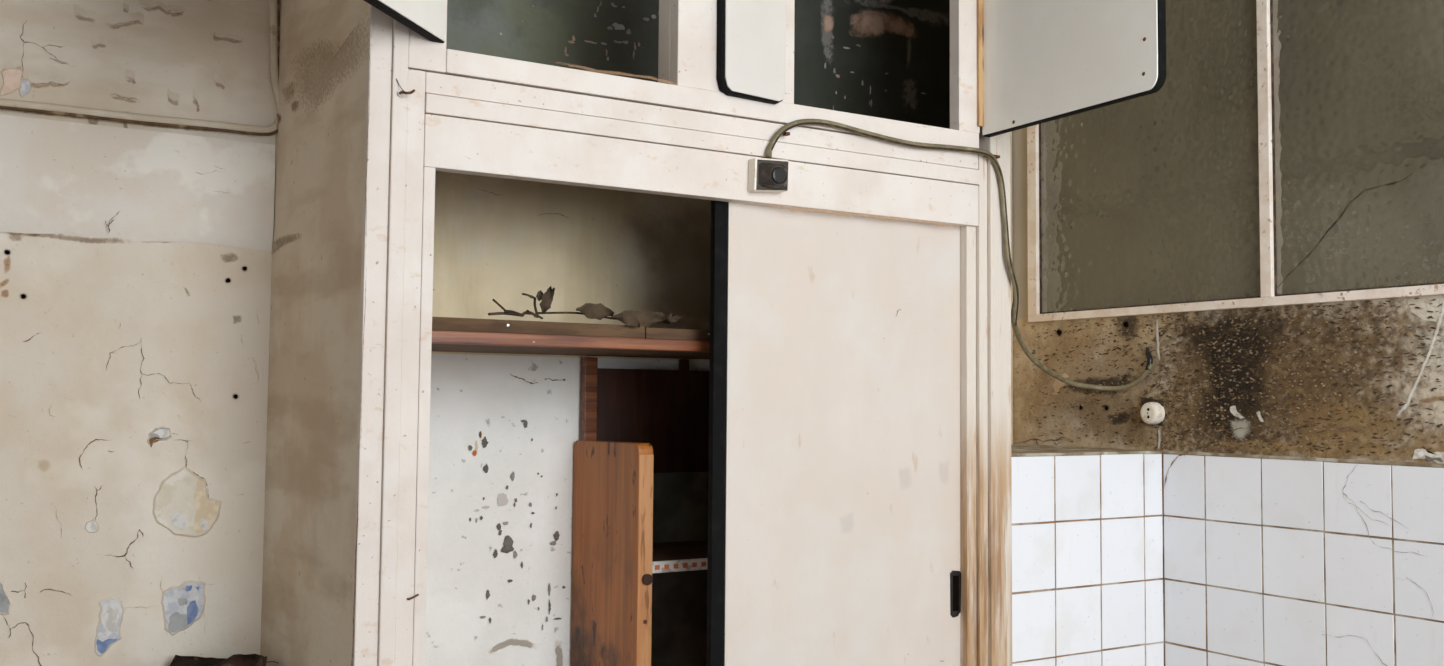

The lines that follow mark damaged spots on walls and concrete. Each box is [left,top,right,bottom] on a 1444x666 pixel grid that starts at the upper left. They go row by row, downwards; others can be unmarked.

crack [106,324,200,400]
water stain [1031,298,1444,460]
crack [79,439,113,520]
spalling [152,466,221,538]
peeling [468,431,489,473]
peeling [469,471,535,583]
crack [5,583,65,666]
peeling [94,597,125,657]
crack [106,529,168,629]
peeling [161,580,206,636]
peeling [491,639,533,652]
peeling [528,583,565,630]